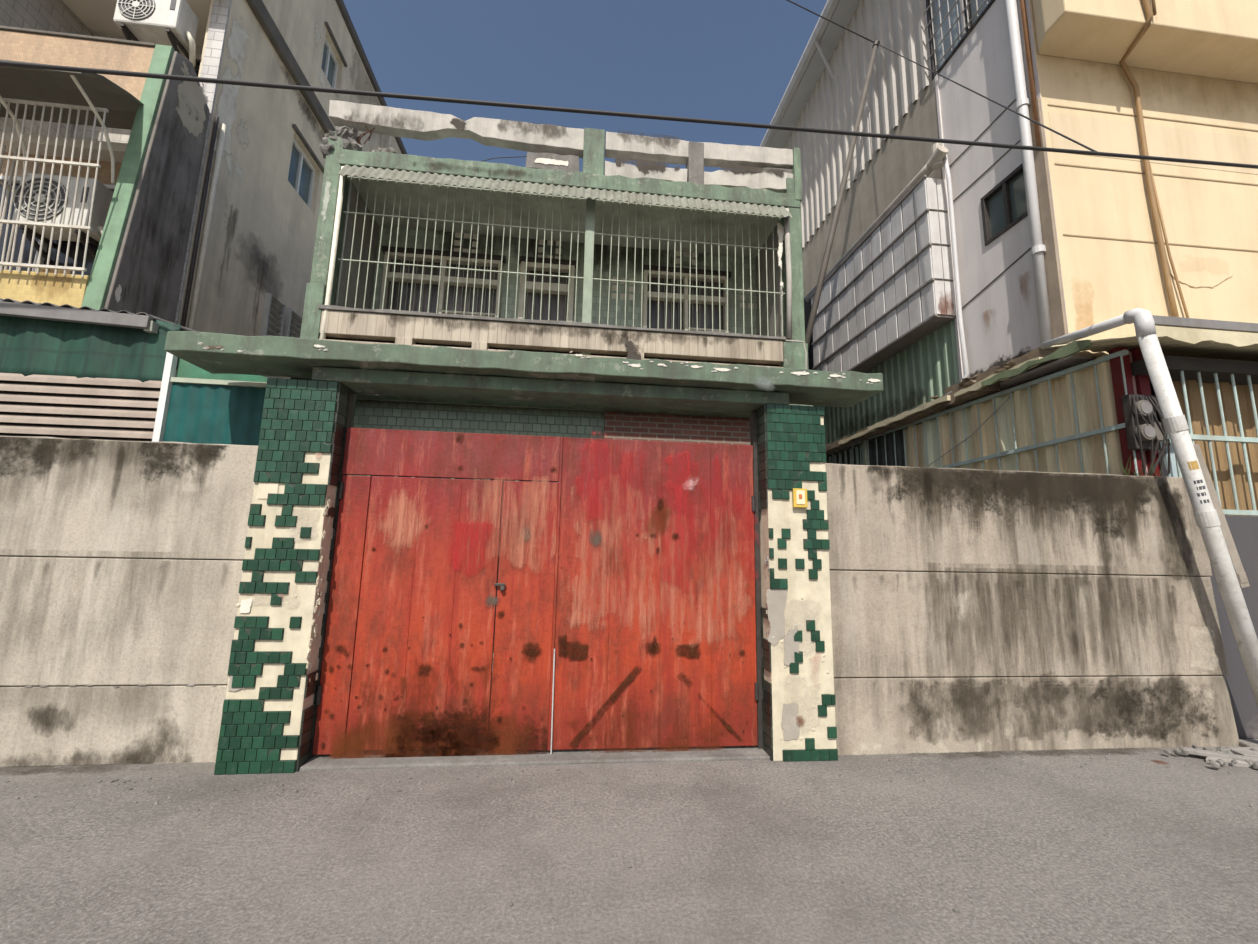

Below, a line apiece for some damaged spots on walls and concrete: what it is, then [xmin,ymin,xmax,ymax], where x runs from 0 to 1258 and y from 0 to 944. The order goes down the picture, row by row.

spalling [319,126,398,159]
spalling [622,340,738,372]
spalling [779,371,880,384]
leakage [116,442,227,481]
leakage [868,466,1193,581]
spalling [764,556,829,685]
rust [559,635,592,660]
rust [672,638,700,658]
rust [376,696,547,758]
rust [571,667,640,748]
leakage [1006,675,1211,739]
leakage [110,730,169,765]